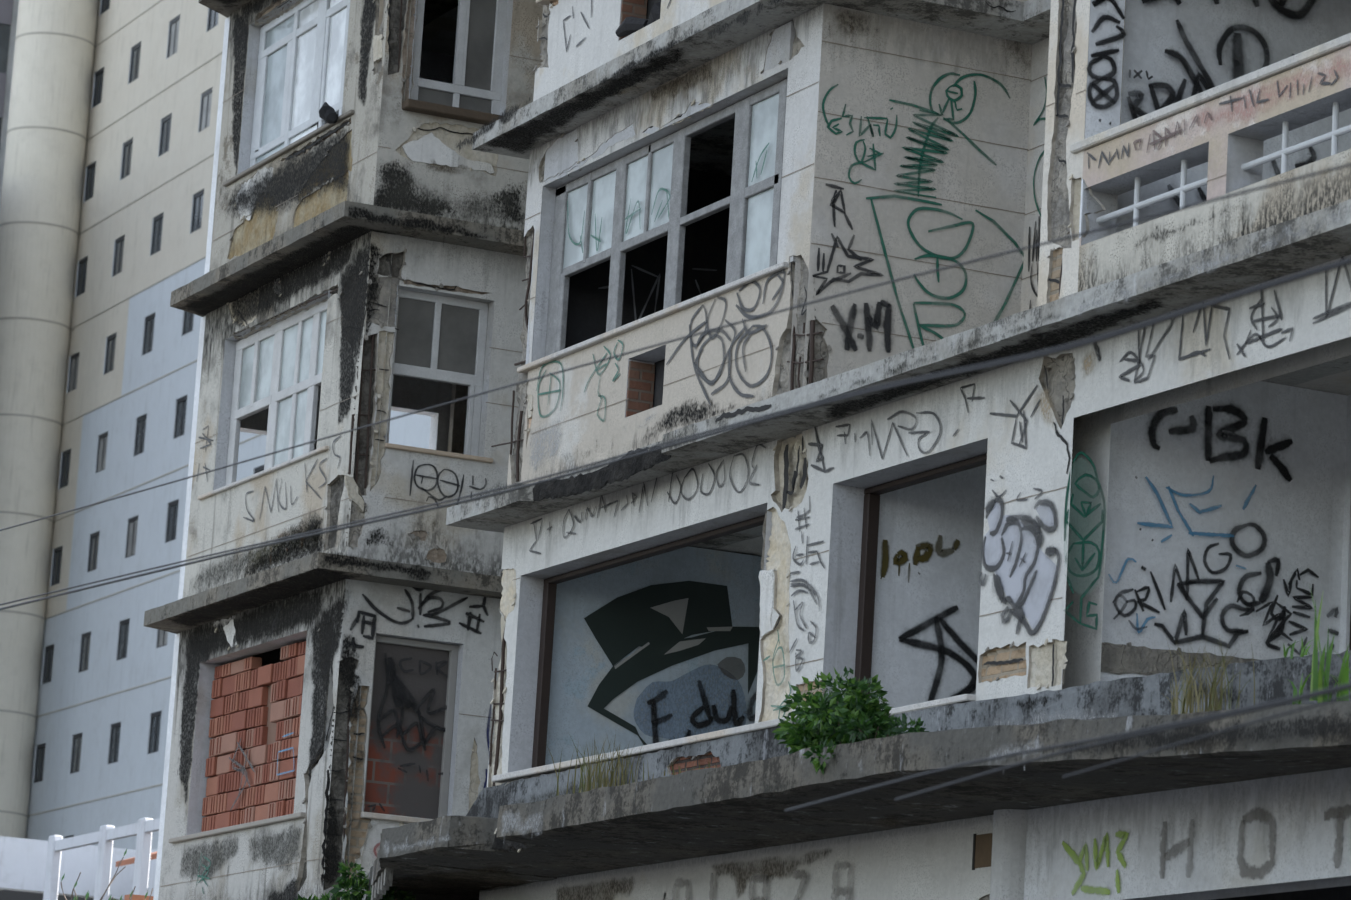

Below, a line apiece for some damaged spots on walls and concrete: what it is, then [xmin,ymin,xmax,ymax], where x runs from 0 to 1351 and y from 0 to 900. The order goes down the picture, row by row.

leakage [457,0,782,154]
leakage [228,130,350,215]
peeling [395,122,498,176]
spalling [1047,0,1106,303]
leakage [184,162,523,424]
spalling [1039,353,1076,429]
leakage [169,517,431,803]
spalling [978,638,1068,690]
spalling [667,751,721,775]
leakage [1060,715,1351,754]
leakage [181,826,300,900]
leakage [321,790,355,884]